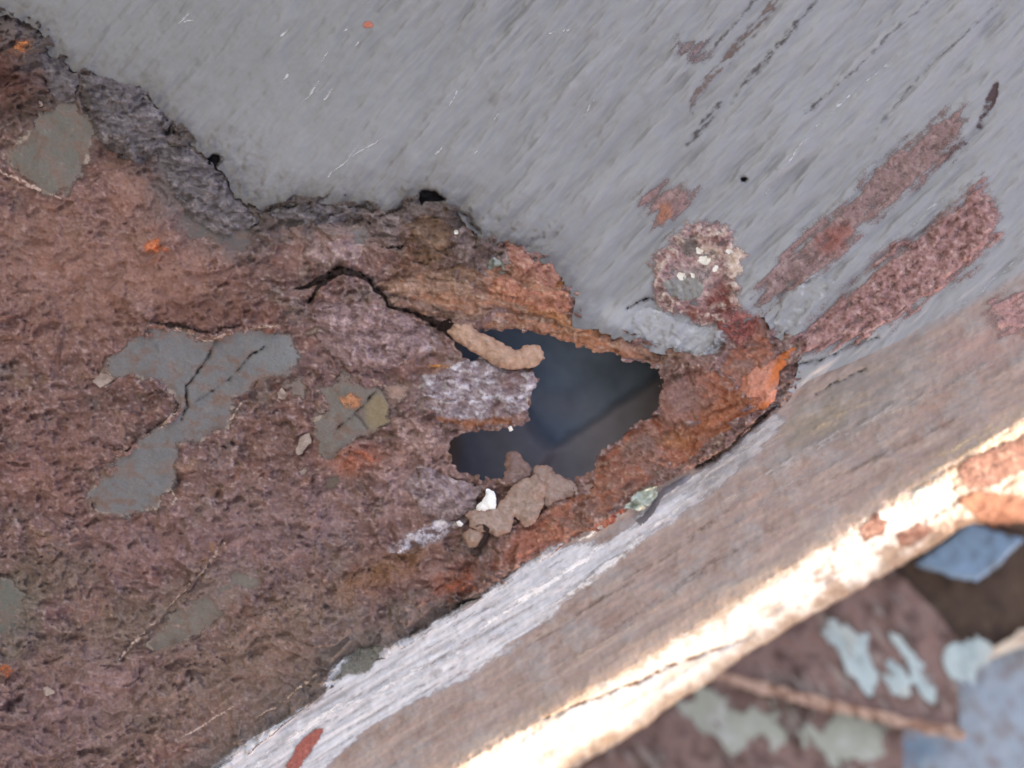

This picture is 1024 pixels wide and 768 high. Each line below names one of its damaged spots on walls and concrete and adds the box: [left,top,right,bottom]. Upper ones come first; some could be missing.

spalling [419,190,445,205]
peeling [488,257,506,274]
crack [294,267,446,332]
rust [616,108,1004,490]
peeling [447,323,545,370]
rust [0,7,662,768]
peeling [457,451,593,548]